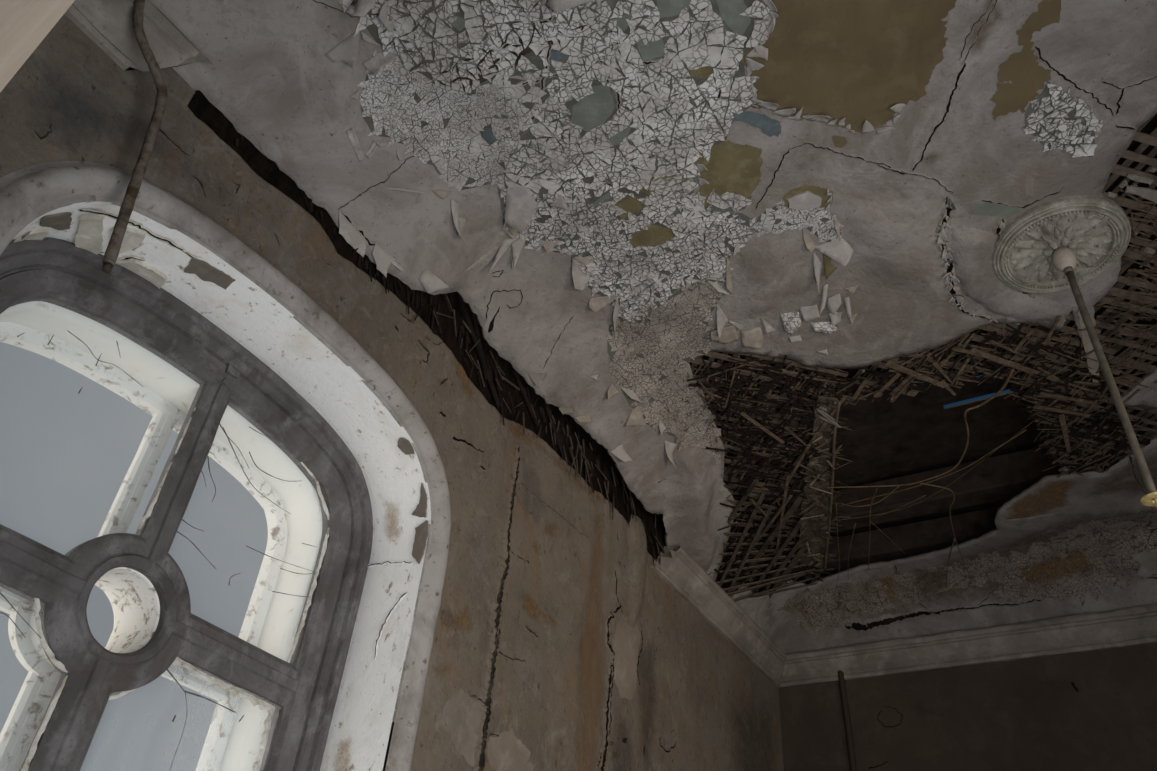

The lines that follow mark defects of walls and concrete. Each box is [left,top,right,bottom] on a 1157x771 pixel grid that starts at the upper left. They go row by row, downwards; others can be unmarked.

crack [755,0,998,209]
crack [1034,45,1157,131]
crack [981,187,1065,209]
peeling [14,212,167,289]
flaking render [184,0,1157,606]
crack [394,312,676,771]
flaking render [612,615,641,700]
crack [843,597,1042,637]
flaking render [442,688,534,771]